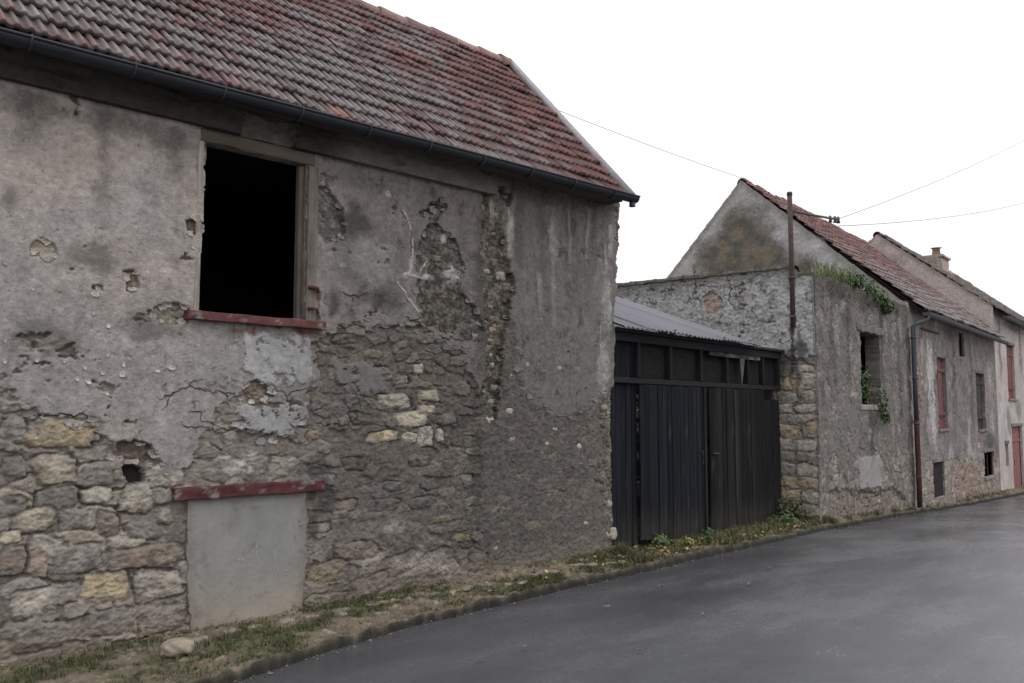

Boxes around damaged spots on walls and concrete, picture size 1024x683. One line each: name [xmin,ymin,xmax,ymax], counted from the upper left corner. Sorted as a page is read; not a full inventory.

spalling [30,236,58,262]
spalling [117,270,141,291]
spalling [153,302,189,324]
spalling [186,214,205,249]
spalling [304,180,348,243]
spalling [314,186,515,419]
crack [396,199,468,341]
peeling [14,401,172,478]
crack [160,379,241,432]
spalling [230,380,305,445]